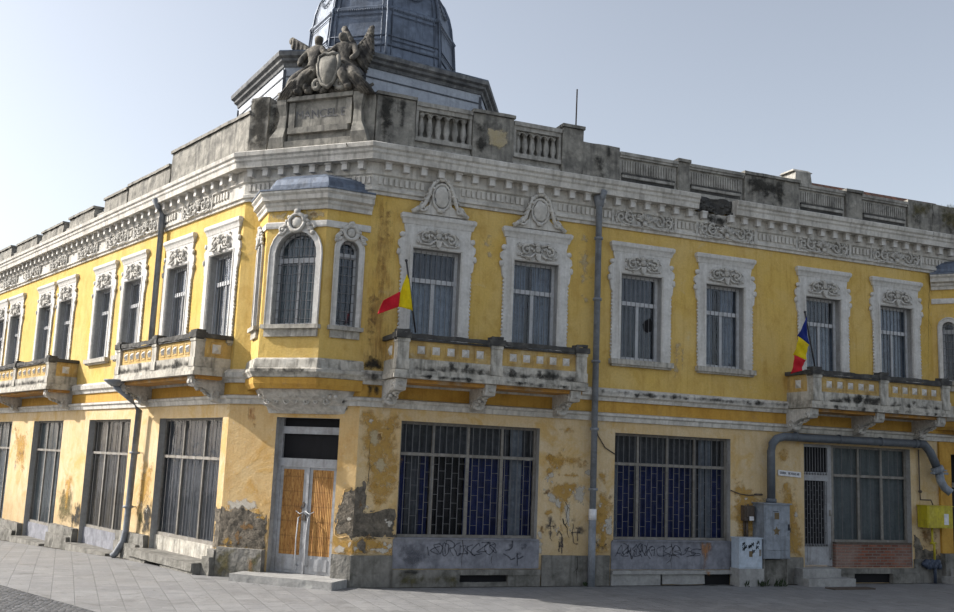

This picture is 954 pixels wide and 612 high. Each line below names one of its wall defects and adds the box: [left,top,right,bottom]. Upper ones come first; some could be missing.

leakage [477,124,507,151]
leakage [748,177,784,205]
leakage [416,363,487,382]
leakage [509,369,575,389]
leakage [830,395,880,411]
spalling [331,411,398,554]
peeling [544,455,613,552]
spalling [212,498,269,550]